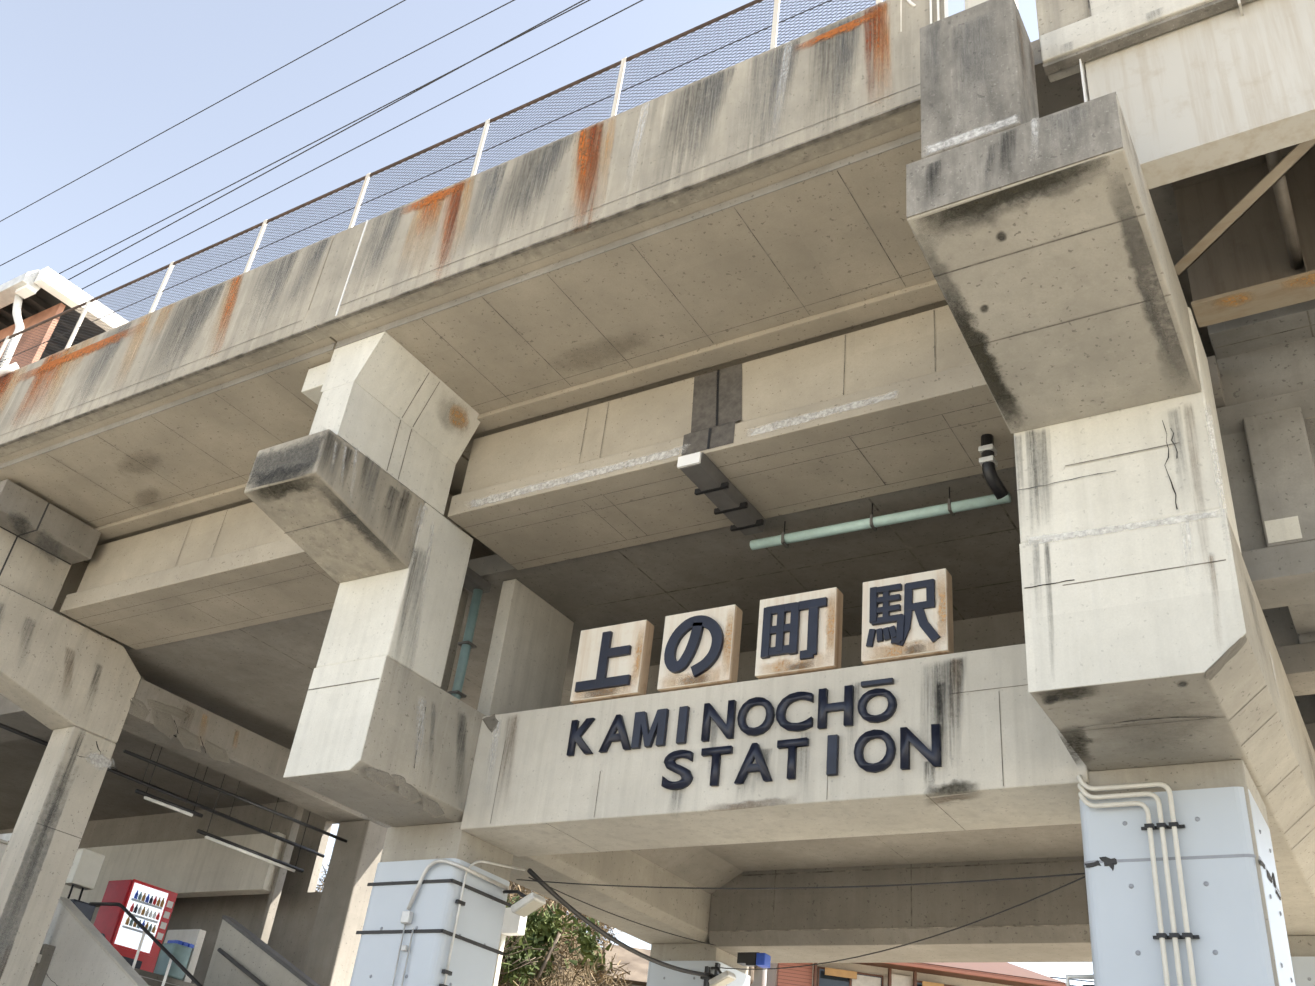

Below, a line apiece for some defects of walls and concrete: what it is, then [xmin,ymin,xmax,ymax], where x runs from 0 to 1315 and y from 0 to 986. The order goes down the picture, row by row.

rust [805,4,887,60]
rust [578,124,609,190]
rust [410,180,470,242]
leakage [943,165,1078,221]
leakage [1127,225,1182,355]
rust [0,316,149,402]
leakage [933,274,1013,413]
crack [1162,420,1178,510]
leakage [937,661,963,721]
spalling [365,767,445,818]
leakage [931,782,969,801]